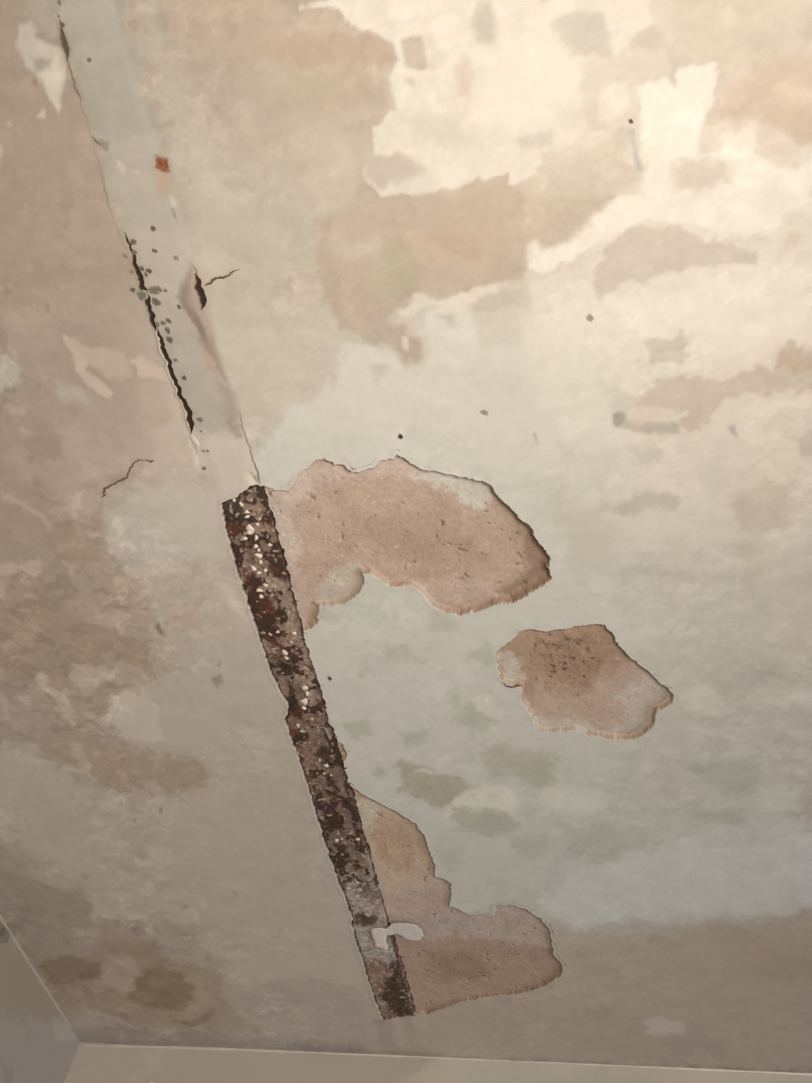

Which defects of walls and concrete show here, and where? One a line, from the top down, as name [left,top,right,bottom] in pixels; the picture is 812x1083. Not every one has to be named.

crack [193,264,240,310]
crack [125,233,199,450]
crack [101,459,154,499]
peeling [0,283,812,1023]
leakage [0,935,232,1030]